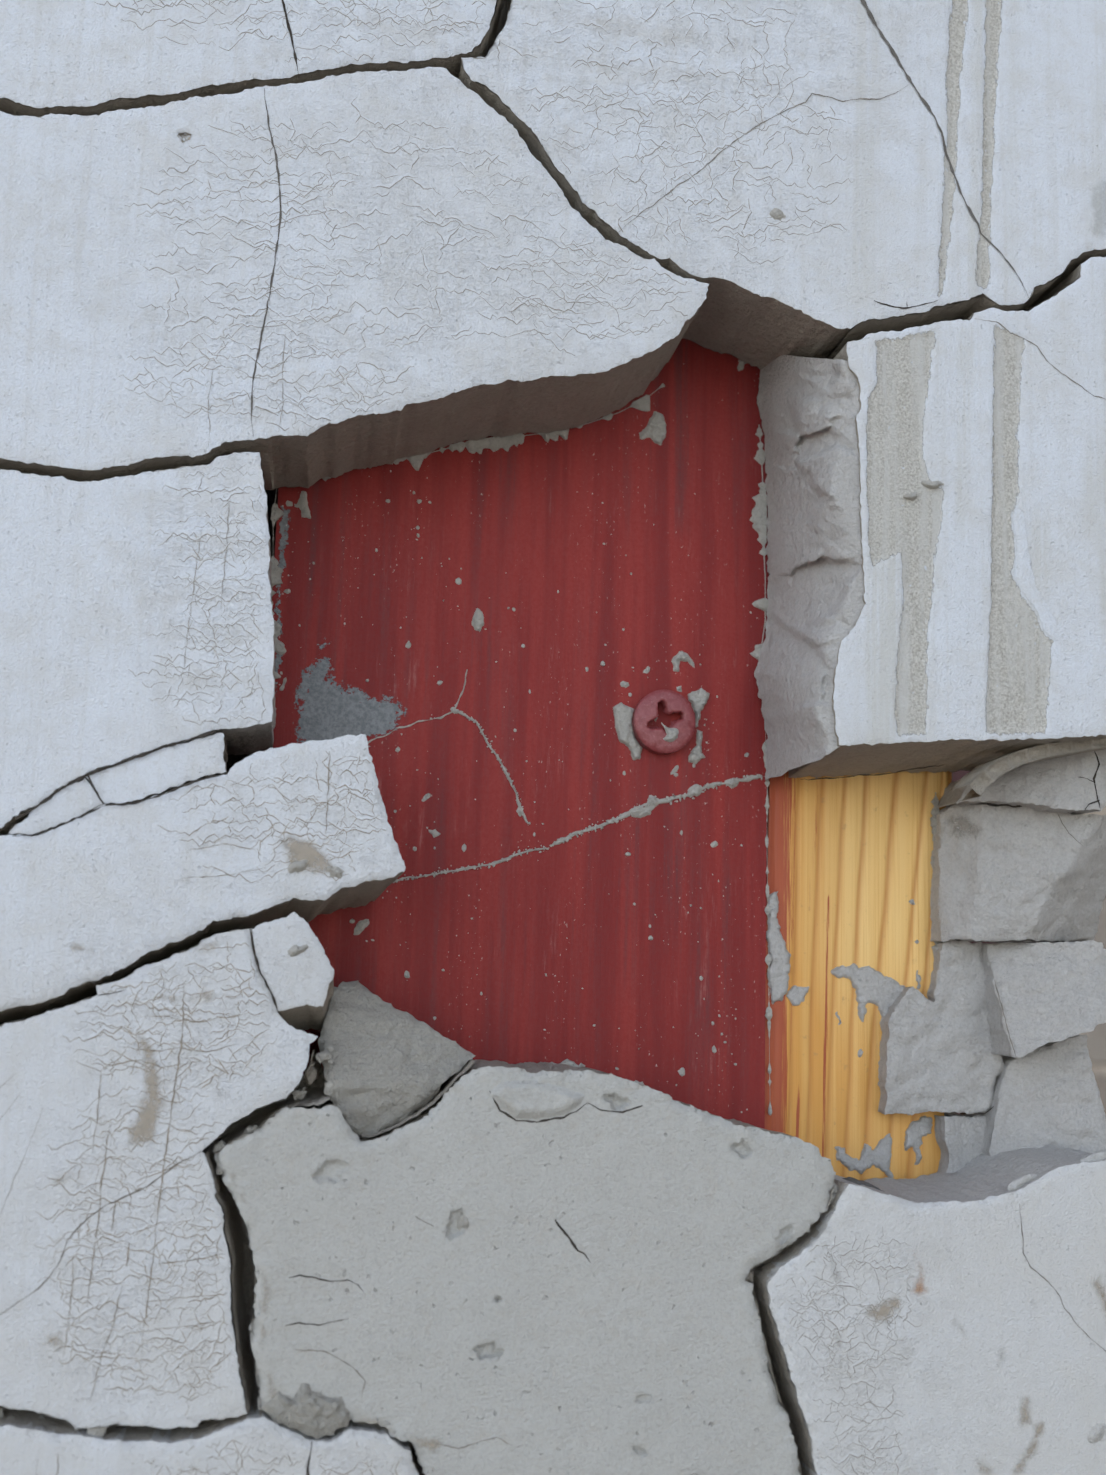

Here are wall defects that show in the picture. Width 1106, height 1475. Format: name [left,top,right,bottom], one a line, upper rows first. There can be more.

peeling [938,0,1002,296]
peeling [274,506,291,691]
peeling [293,637,407,743]
crack [0,0,1106,883]
spalling [754,330,944,780]
spalling [878,324,1106,1173]
crack [987,938,1081,946]
crack [0,901,511,1475]
spalling [310,1158,350,1184]
crack [361,1059,643,1141]
crack [555,1219,590,1262]
crack [746,1179,923,1475]